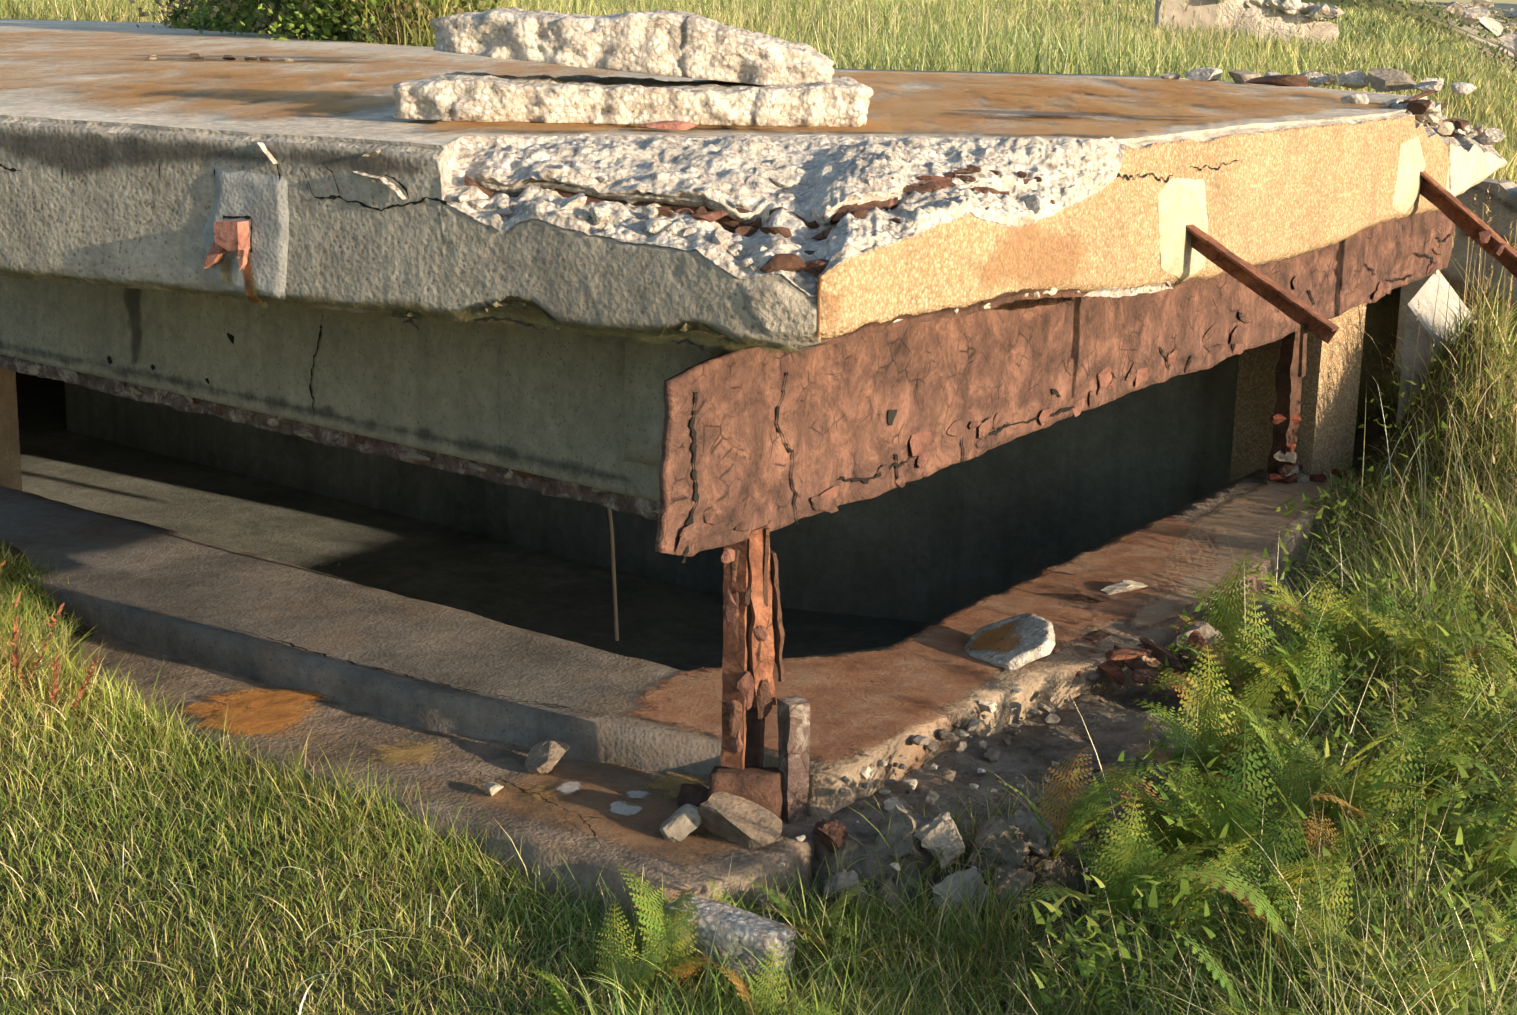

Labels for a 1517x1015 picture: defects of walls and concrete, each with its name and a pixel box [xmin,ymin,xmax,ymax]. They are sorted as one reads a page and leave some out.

rust [639,120,699,130]
crack [298,164,447,211]
spalling [441,133,1173,347]
rust [221,253,266,305]
rust [1373,281,1391,300]
rust [1427,247,1517,343]
crack [309,315,323,417]
rust [1073,311,1254,417]
rust [876,412,1004,487]
rust [675,506,751,556]
rust [811,486,841,513]
rust [627,518,1219,762]